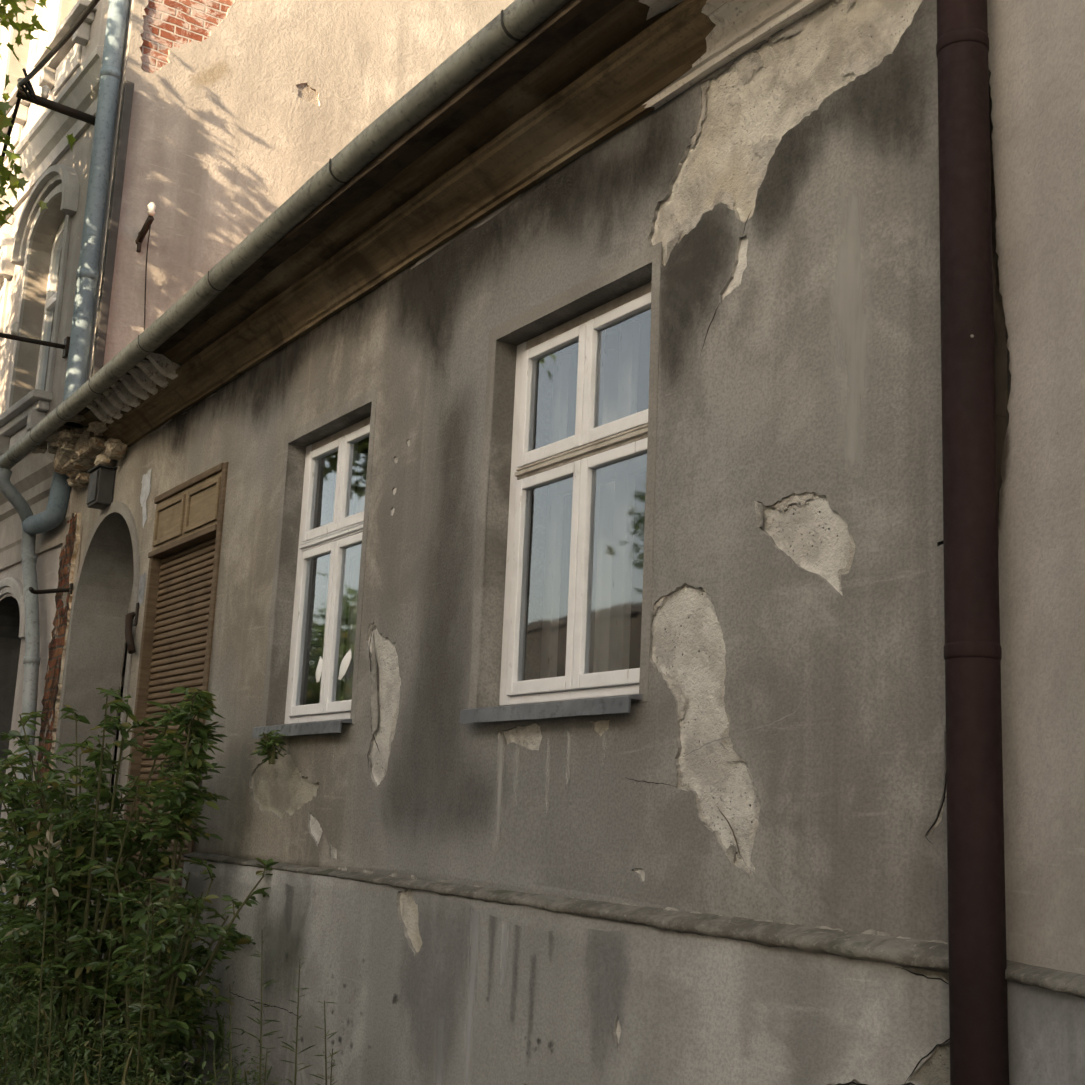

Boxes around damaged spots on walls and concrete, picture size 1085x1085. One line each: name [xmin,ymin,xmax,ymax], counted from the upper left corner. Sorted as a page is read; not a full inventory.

flaking render [139,0,235,73]
spalling [296,83,320,106]
peeling [638,0,923,305]
peeling [754,491,855,596]
flaking render [27,513,81,857]
peeling [365,622,401,787]
peeling [501,723,542,750]
peeling [650,583,761,879]
crack [925,774,946,843]
spalling [389,873,423,955]
spalling [908,1041,950,1085]